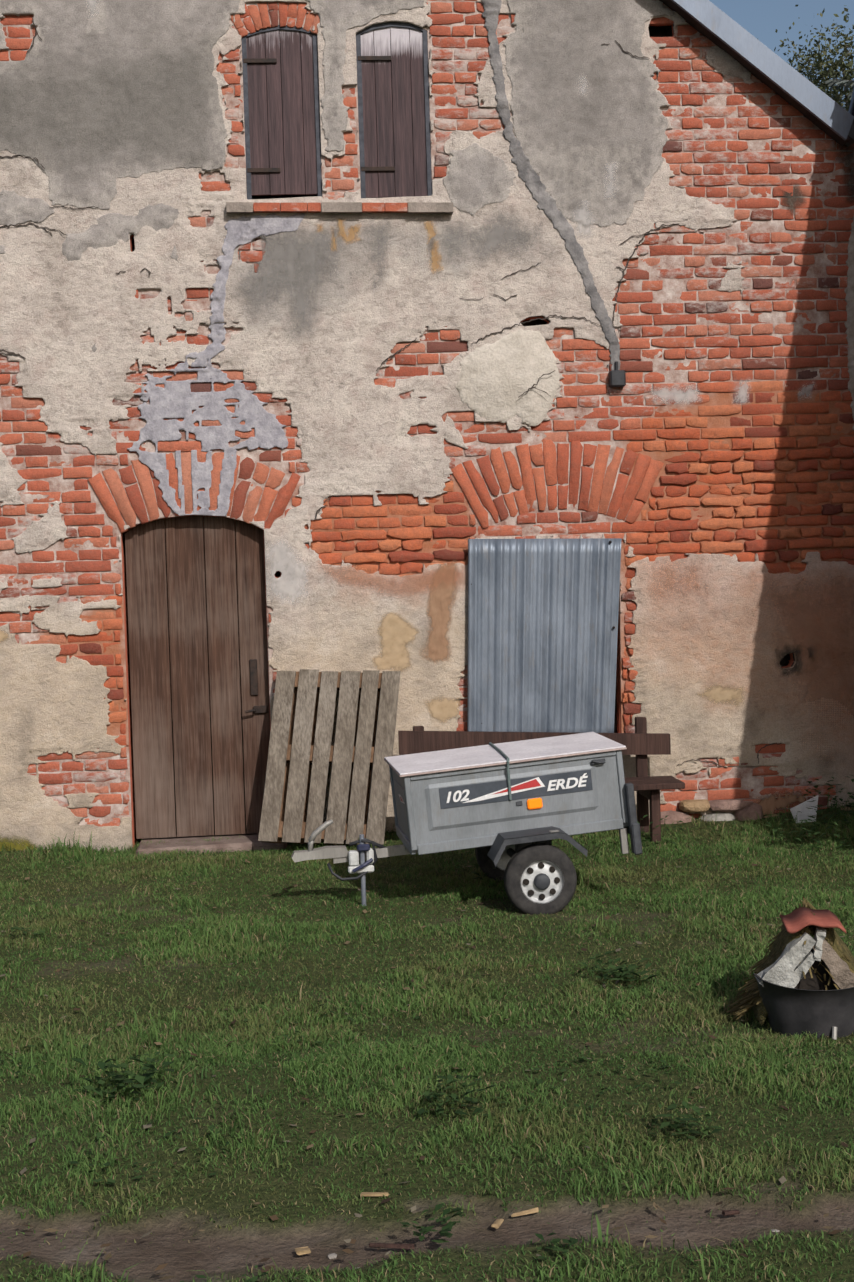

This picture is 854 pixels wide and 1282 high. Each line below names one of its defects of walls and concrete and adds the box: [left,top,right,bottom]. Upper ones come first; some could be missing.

spalling [0,15,37,61]
spalling [199,2,318,191]
flaking render [62,203,214,261]
spalling [238,236,266,273]
spalling [304,0,854,733]
spalling [0,260,310,827]
spalling [660,743,836,818]